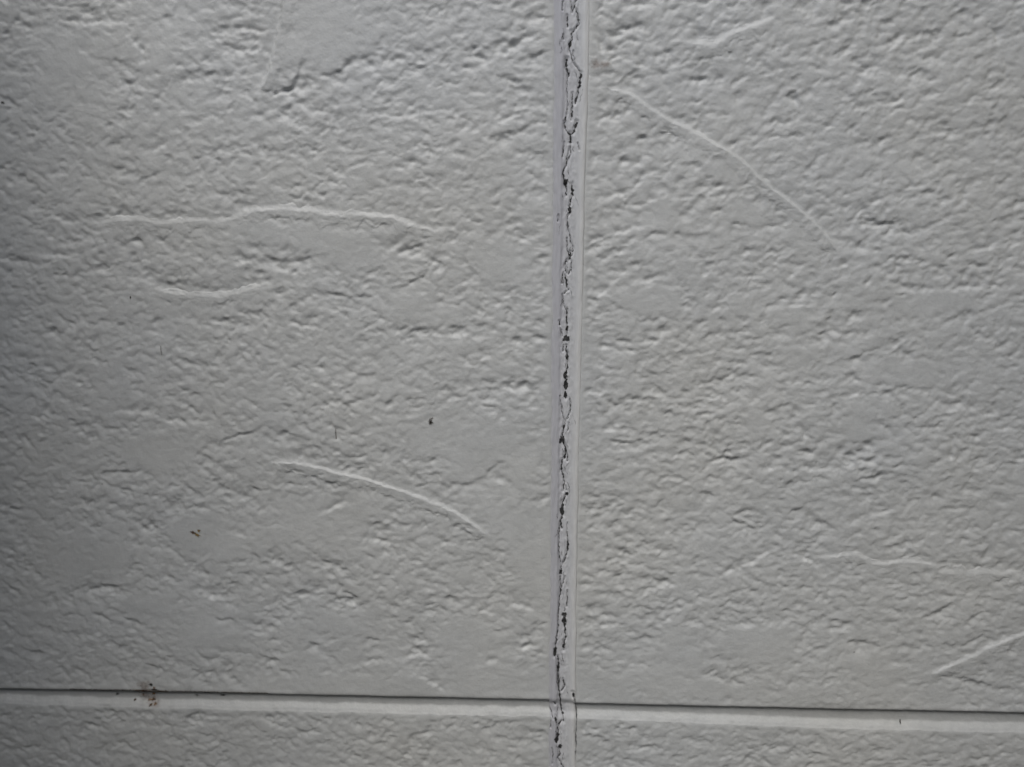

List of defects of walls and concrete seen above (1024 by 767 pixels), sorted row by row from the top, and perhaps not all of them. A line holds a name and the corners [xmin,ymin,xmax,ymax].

crack [549,0,583,767]